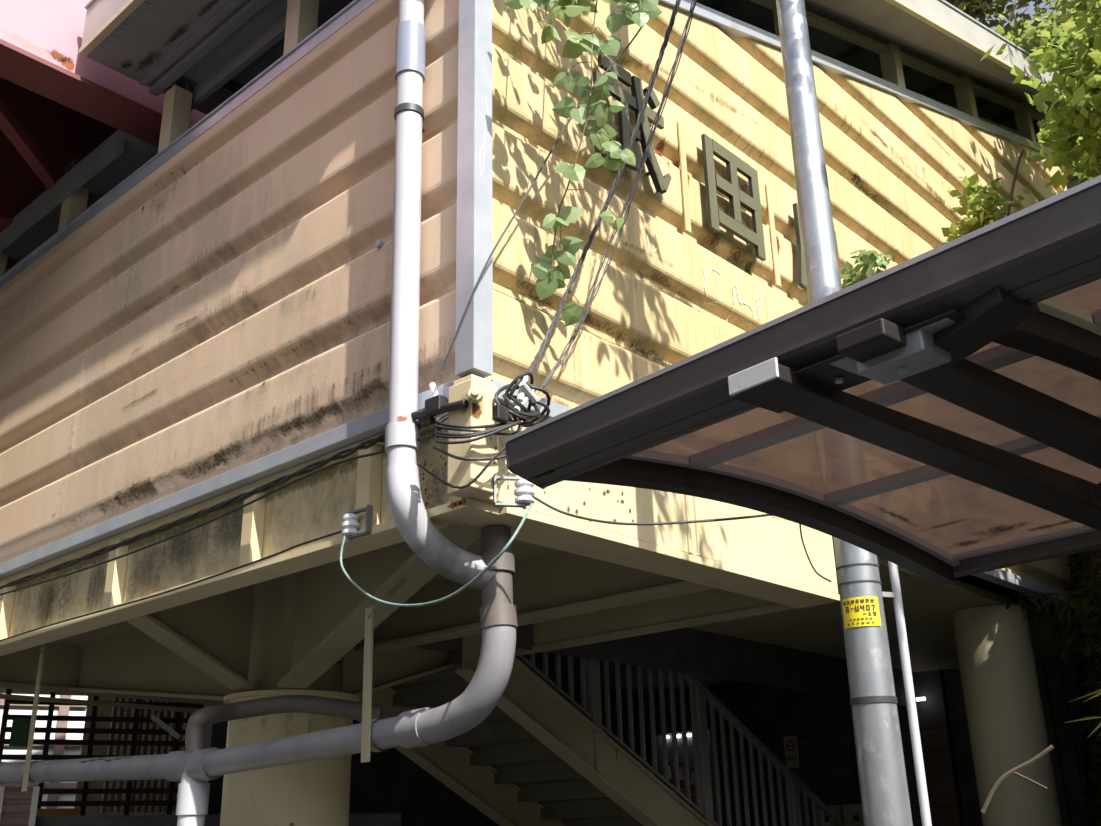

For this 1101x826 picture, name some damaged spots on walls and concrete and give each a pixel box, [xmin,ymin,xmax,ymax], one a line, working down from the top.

corrosion [51,50,74,70]